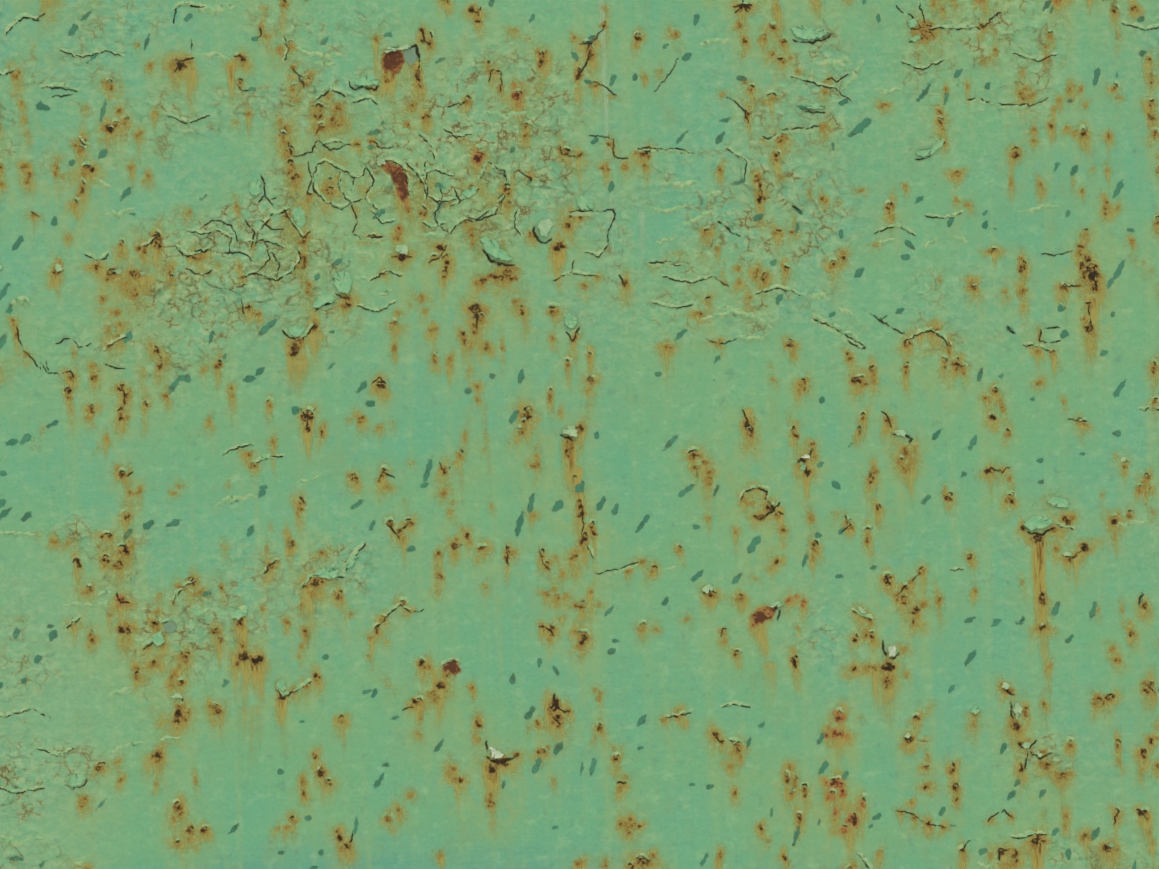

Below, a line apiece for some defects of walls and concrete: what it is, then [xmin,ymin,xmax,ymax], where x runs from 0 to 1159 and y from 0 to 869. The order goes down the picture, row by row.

peeling [349,44,427,103]
crack [789,74,850,100]
crack [186,86,523,290]
crack [356,269,404,313]
crack [648,261,904,351]
corrosion [984,245,1006,261]
corrosion [1001,250,1031,312]
corrosion [1041,228,1107,357]
peeling [1017,497,1077,669]
corrosion [1030,623,1056,636]
peeling [524,691,573,755]
peeling [482,741,542,826]